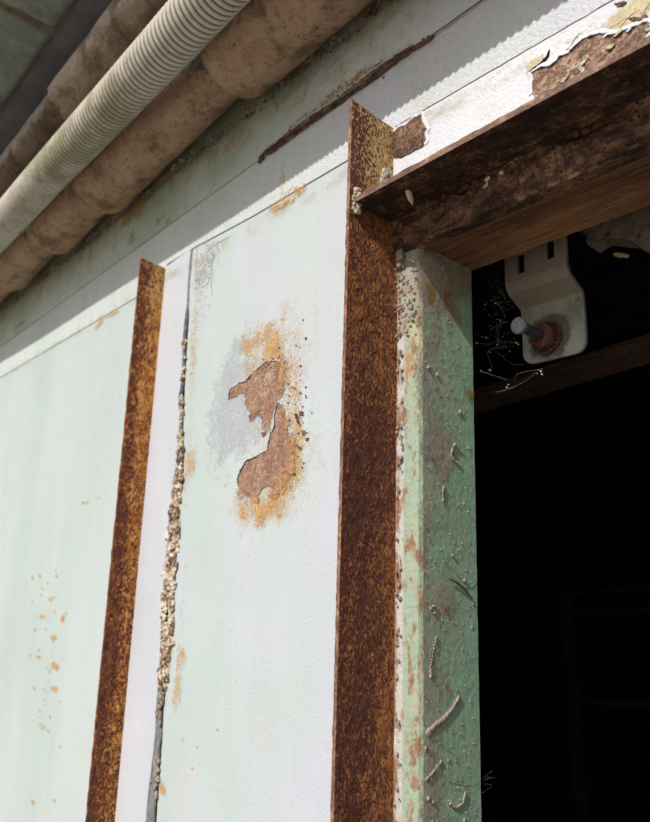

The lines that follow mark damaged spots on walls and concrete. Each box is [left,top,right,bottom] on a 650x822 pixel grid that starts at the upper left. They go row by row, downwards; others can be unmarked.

peeling [257,32,434,165]
rust [258,34,435,164]
rust [393,0,614,158]
peeling [525,0,650,100]
peeling [207,317,313,527]